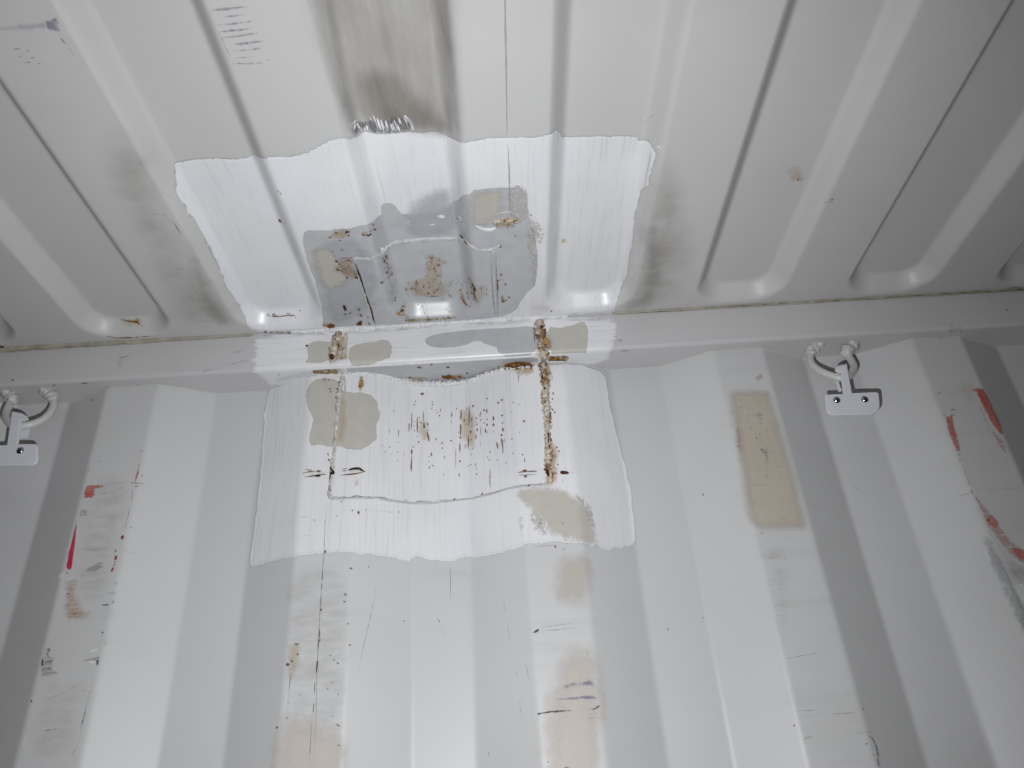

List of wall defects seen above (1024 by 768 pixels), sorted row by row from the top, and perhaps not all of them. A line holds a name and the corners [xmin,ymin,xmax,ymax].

corrosion [380,255,510,322]
corrosion [313,324,346,411]
corrosion [482,362,534,380]
corrosion [541,326,575,424]
corrosion [382,393,525,481]